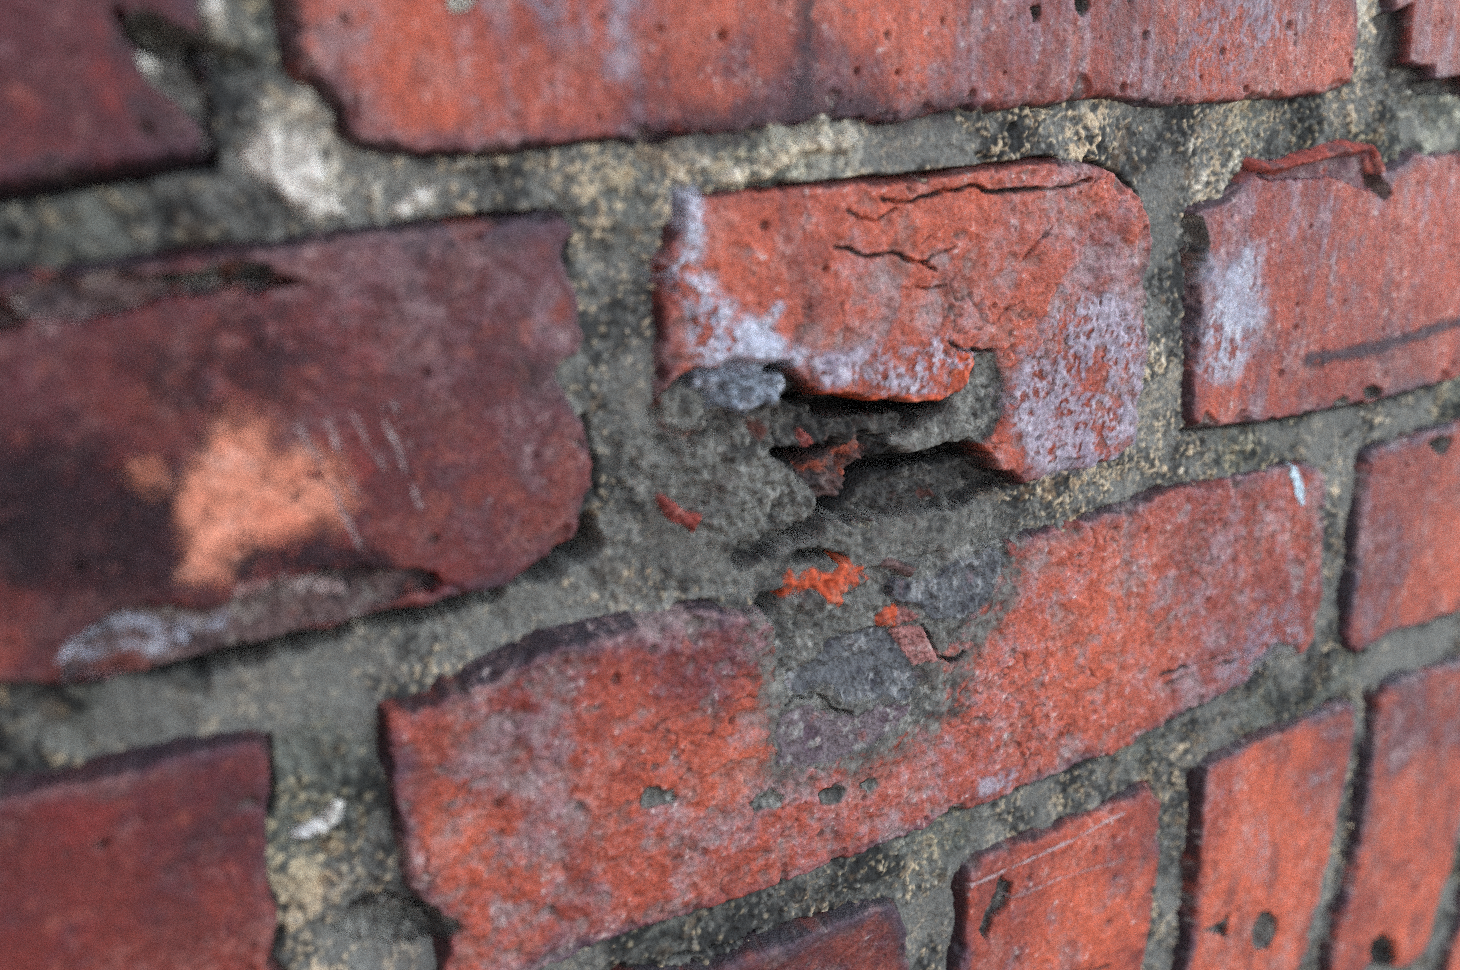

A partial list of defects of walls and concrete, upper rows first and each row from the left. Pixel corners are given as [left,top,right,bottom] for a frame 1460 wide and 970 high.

damp [669,195,972,393]
crack [833,182,1077,262]
efflorescence [1009,293,1145,473]
spalling [58,566,439,680]
spalling [609,351,1024,812]